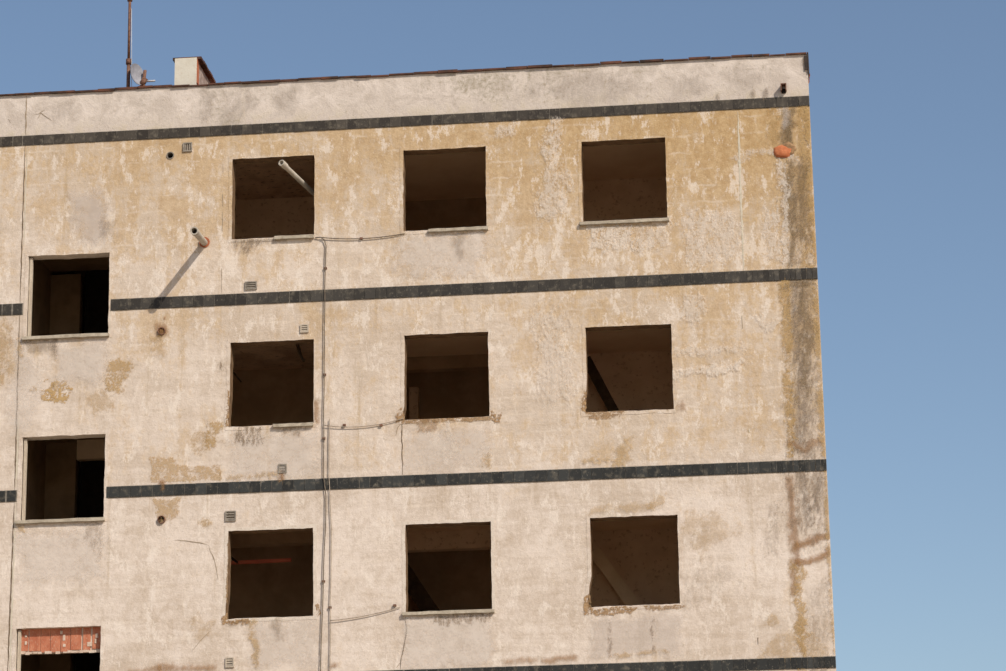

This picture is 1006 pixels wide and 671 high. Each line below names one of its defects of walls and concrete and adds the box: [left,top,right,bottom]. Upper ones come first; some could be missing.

water stain [763,106,817,268]
peeling [29,379,73,403]
peeling [105,358,131,393]
rust [779,280,797,457]
water stain [812,281,826,457]
spalling [395,408,502,424]
peeling [151,457,221,482]
spalling [583,594,684,616]
rust [788,533,831,656]